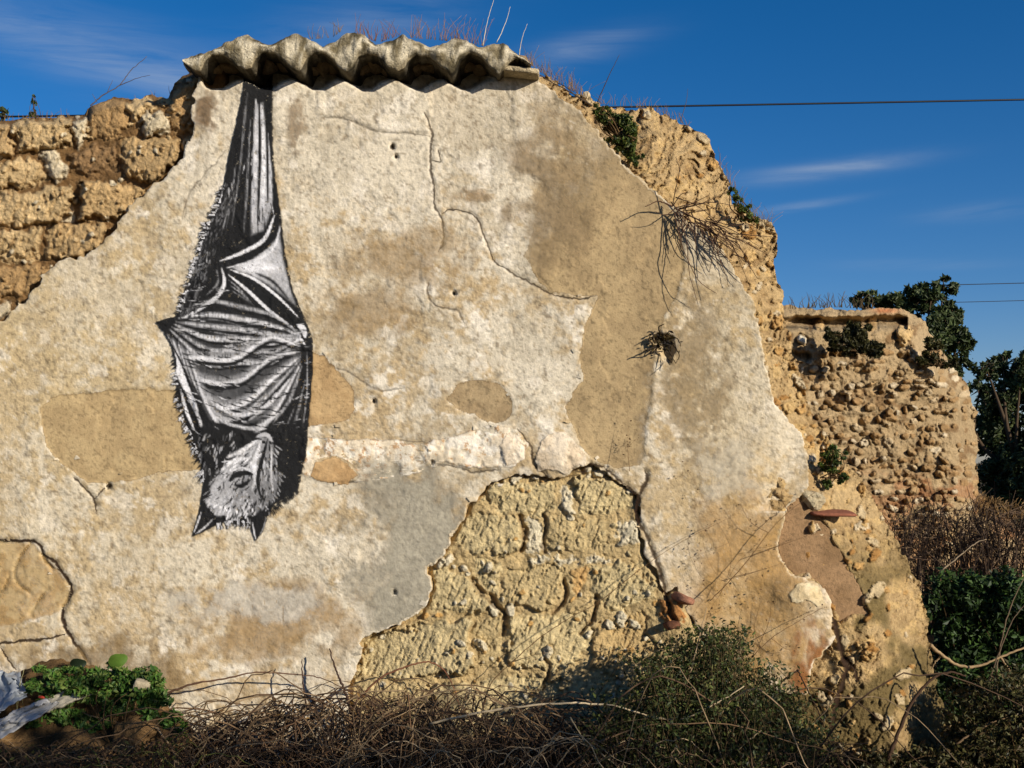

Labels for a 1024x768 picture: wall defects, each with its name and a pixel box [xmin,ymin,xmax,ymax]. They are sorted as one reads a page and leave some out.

crack [425,114,591,300]
peeling [40,387,202,484]
spalling [300,155,709,768]
crack [573,463,667,597]
crack [0,539,82,670]